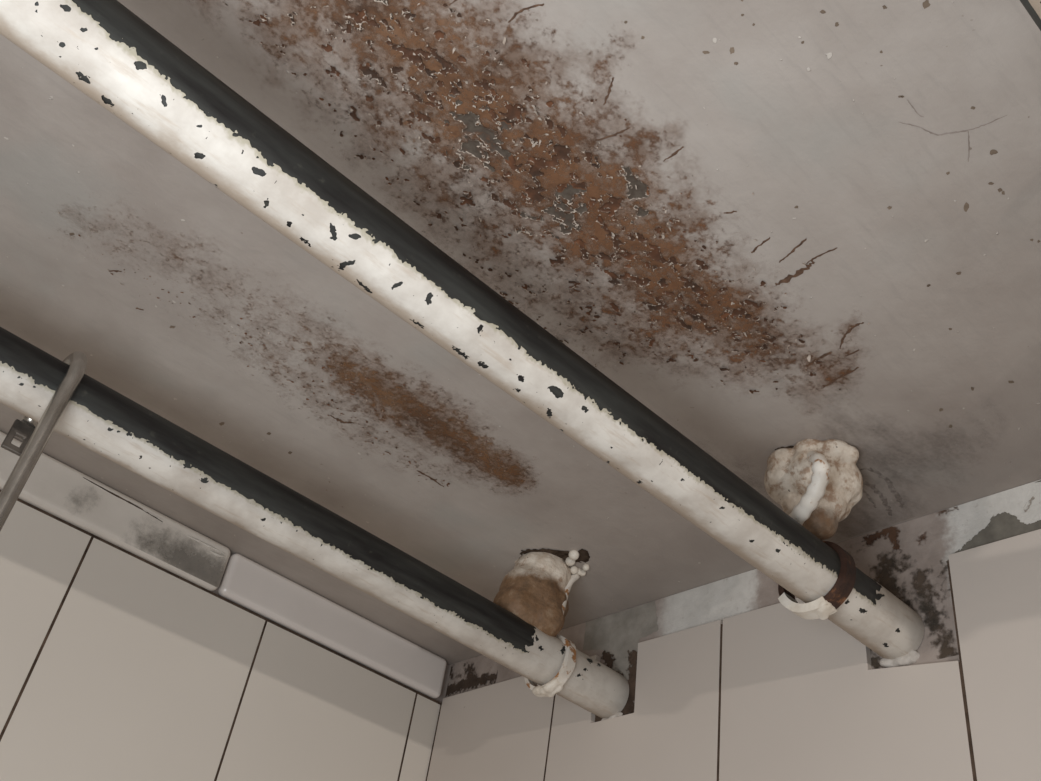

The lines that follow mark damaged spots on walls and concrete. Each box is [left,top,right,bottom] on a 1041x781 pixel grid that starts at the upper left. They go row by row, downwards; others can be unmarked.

corrosion [240,0,870,393]
corrosion [272,337,536,496]
water stain [870,554,959,659]
peeling [946,512,1041,569]